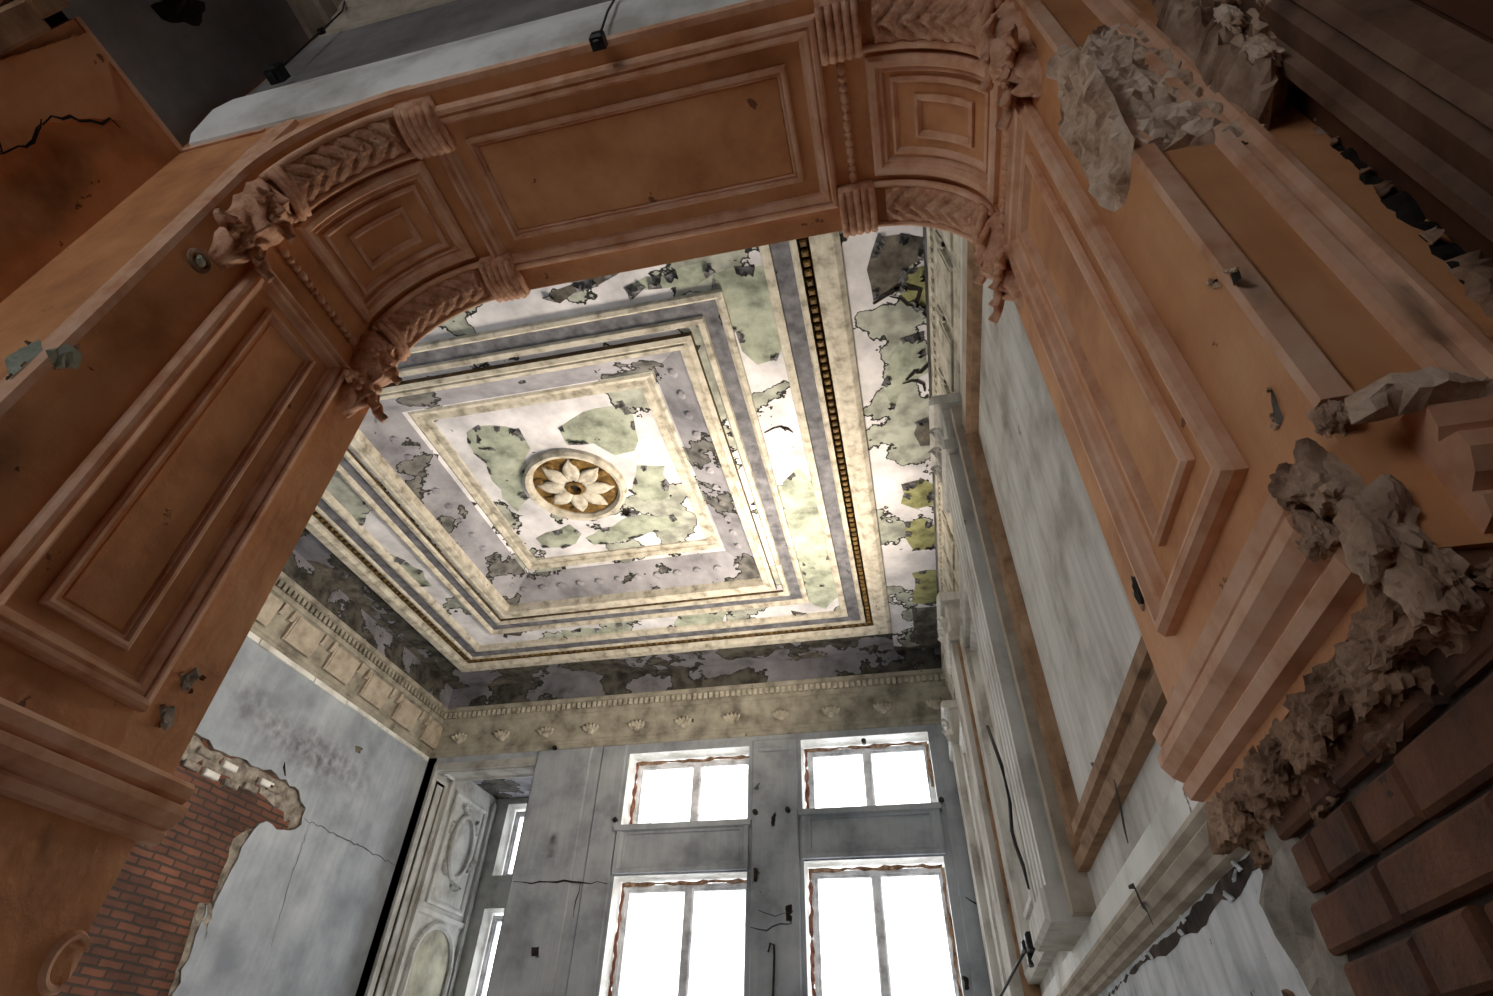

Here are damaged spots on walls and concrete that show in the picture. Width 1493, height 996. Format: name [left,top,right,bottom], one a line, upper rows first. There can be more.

peeling [0,33,120,155]
crack [0,114,121,155]
spalling [1046,0,1294,212]
spalling [1310,117,1493,319]
peeling [542,260,781,365]
peeling [867,233,928,411]
peeling [467,425,530,511]
peeling [536,400,681,549]
peeling [901,478,935,551]
peeling [856,570,939,654]
flaking render [1108,366,1493,996]
flaking render [180,735,302,829]